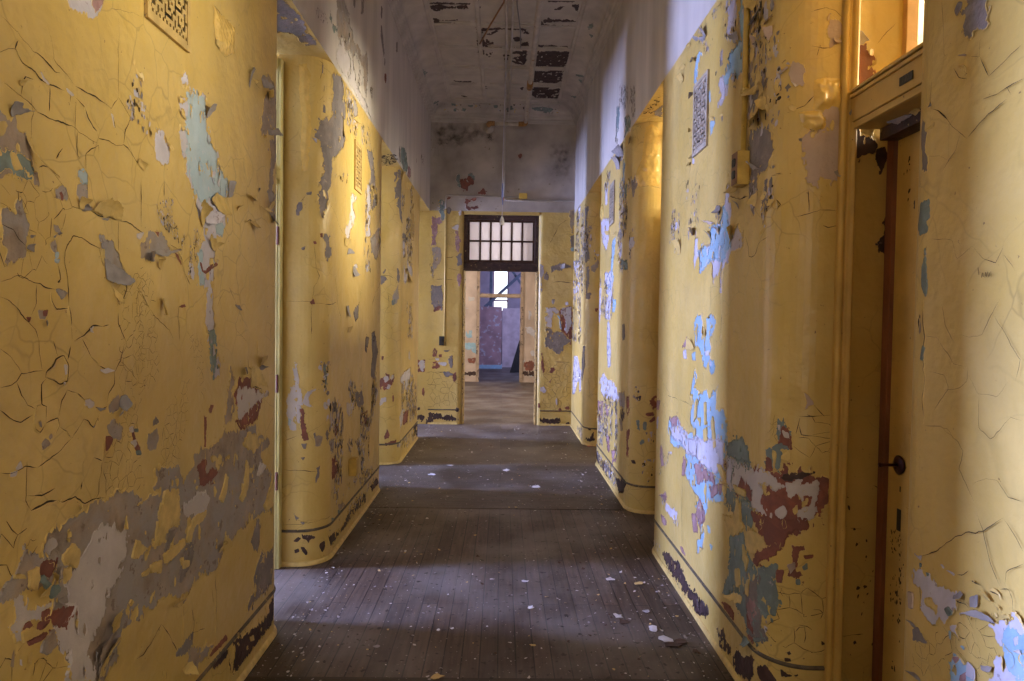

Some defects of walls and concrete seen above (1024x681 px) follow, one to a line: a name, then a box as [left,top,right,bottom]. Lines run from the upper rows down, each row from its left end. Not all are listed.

crack [0,32,204,576]
peeling [0,58,283,681]
peeling [286,0,481,555]
peeling [433,27,584,114]
peeling [541,1,594,38]
peeling [523,85,829,681]
peeling [669,0,806,294]
peeling [799,106,852,189]
crack [923,306,1022,581]
crack [928,46,1022,166]
crack [0,646,66,681]
peeling [890,530,1024,681]